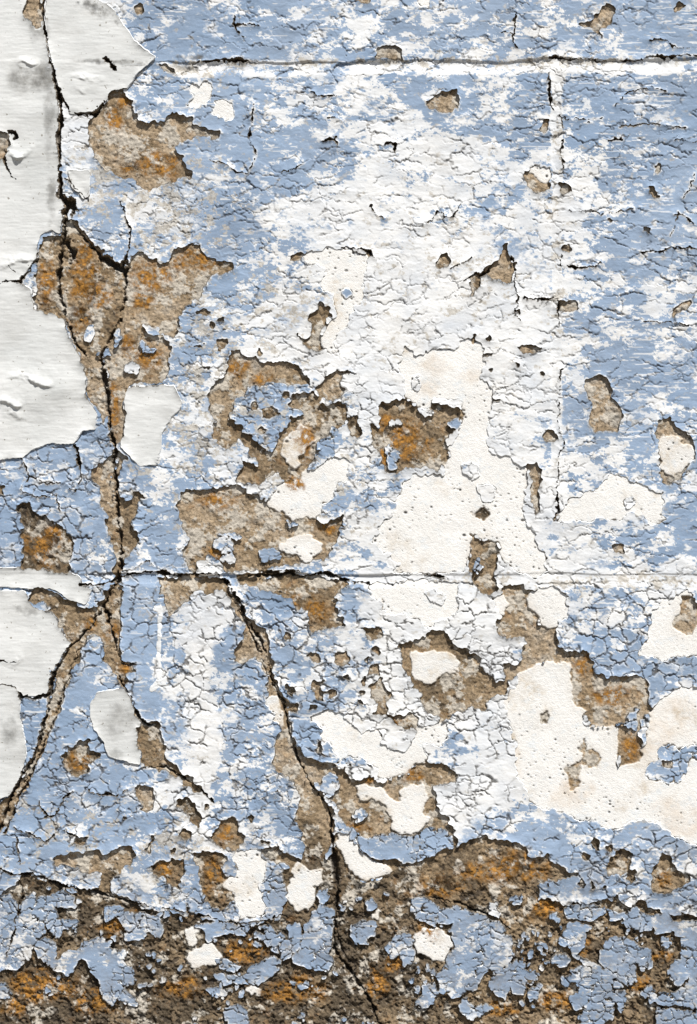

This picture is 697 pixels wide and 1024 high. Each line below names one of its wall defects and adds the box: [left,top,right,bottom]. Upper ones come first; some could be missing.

peeling [88,81,234,192]
crack [0,0,383,1024]
spalling [0,220,697,1024]